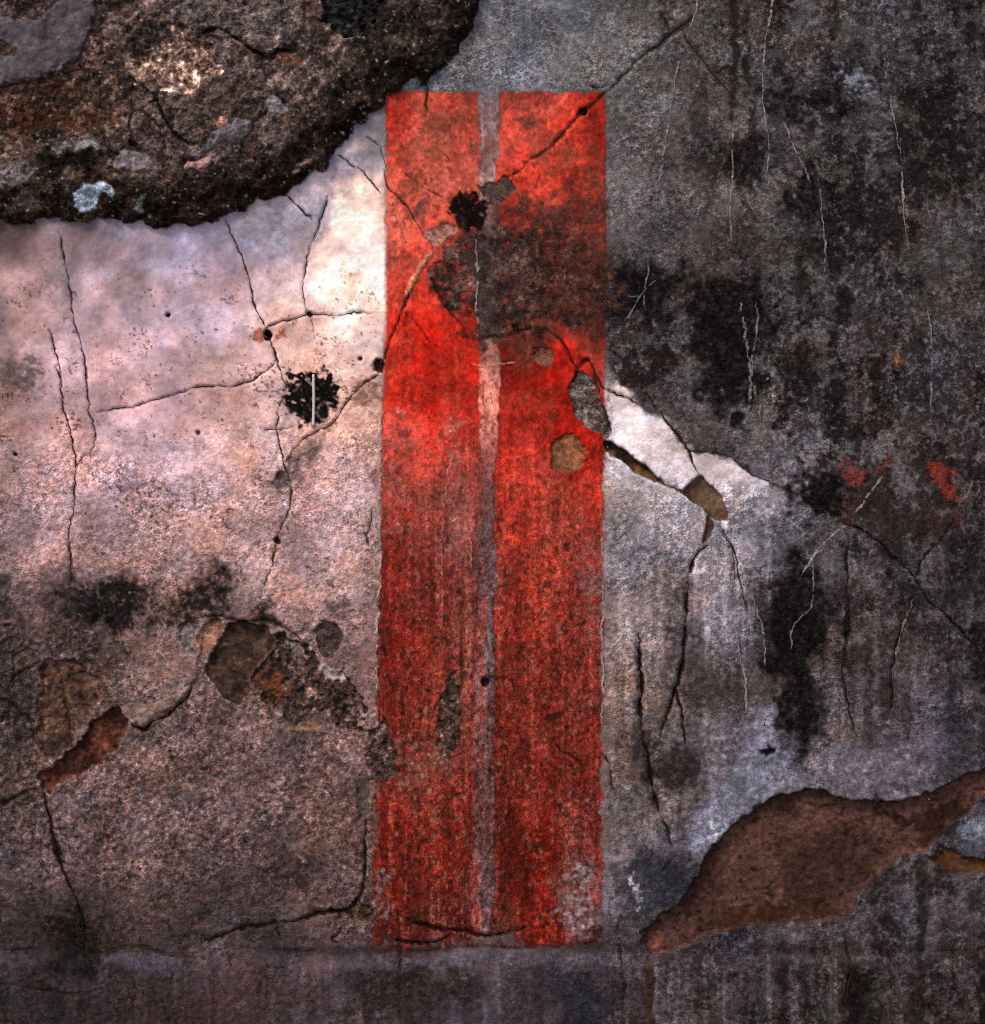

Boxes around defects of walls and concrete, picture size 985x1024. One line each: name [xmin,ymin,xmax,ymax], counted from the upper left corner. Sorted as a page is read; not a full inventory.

spalling [121,0,305,169]
crack [337,137,442,234]
crack [510,14,747,177]
mould [50,559,233,635]
mould [283,364,340,429]
crack [49,193,782,641]
leakage [427,183,779,428]
spalling [683,476,730,544]
spalling [179,620,462,821]
crack [637,529,748,869]
leakage [612,529,849,930]
spalling [640,768,985,955]